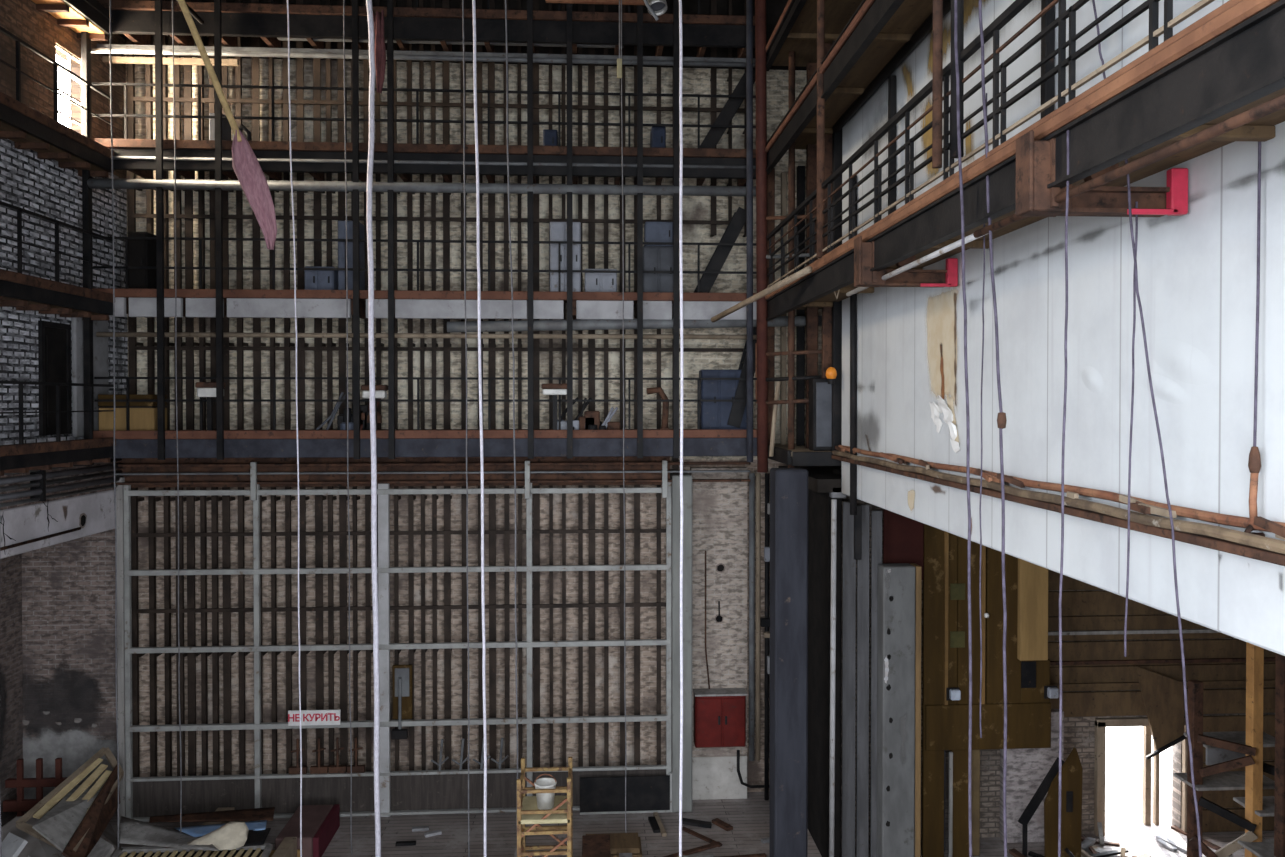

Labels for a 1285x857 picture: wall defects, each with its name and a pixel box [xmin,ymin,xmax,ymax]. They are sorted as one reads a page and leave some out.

peeling [929,396,960,453]